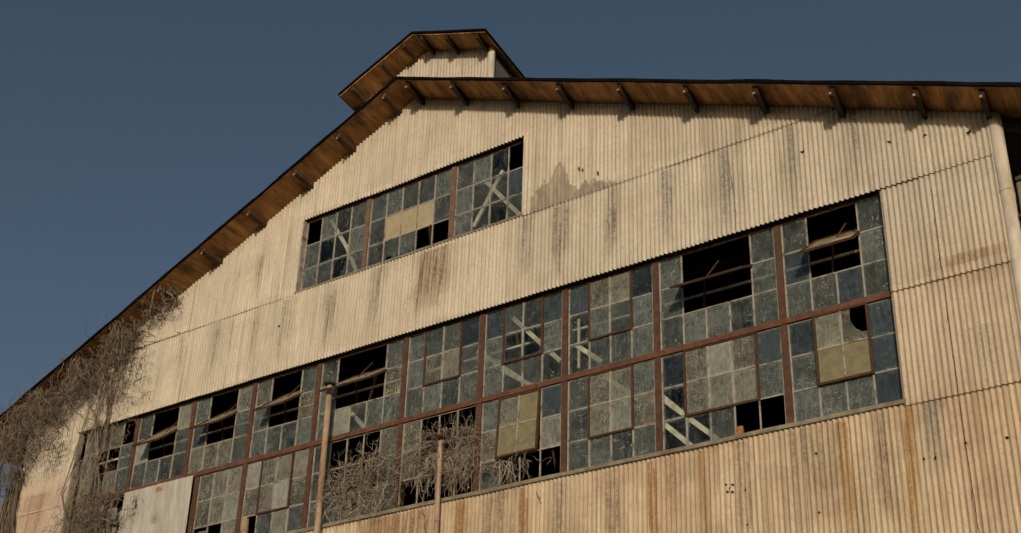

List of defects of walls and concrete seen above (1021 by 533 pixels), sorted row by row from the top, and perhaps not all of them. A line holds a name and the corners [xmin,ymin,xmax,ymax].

rust [648,463,657,532]